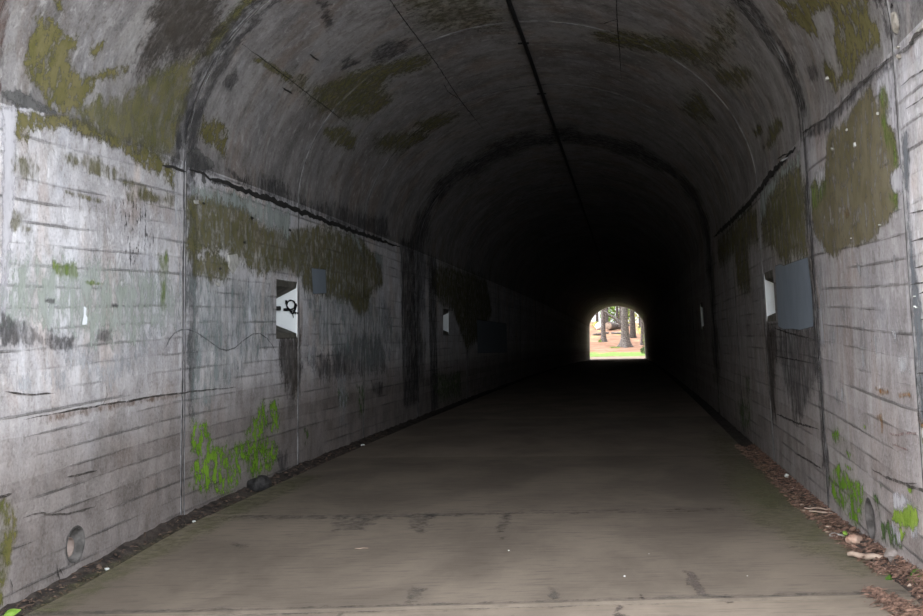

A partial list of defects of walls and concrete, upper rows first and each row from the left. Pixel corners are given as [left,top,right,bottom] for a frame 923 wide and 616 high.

damp [0,98,64,346]
damp [49,331,151,390]
crack [162,165,400,247]
damp [123,0,720,414]
crack [714,10,923,238]
damp [734,0,923,481]